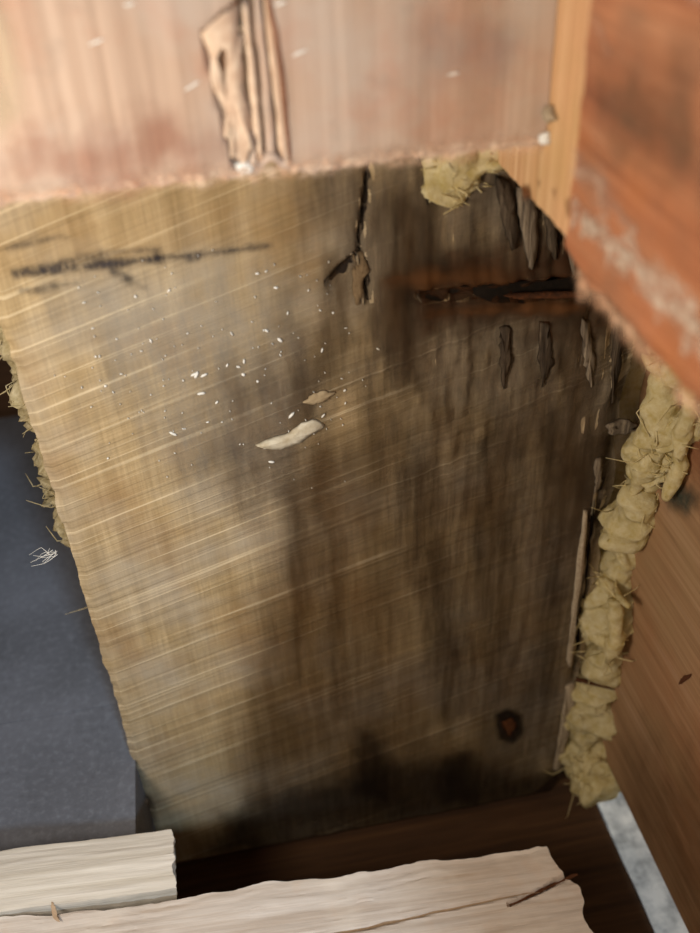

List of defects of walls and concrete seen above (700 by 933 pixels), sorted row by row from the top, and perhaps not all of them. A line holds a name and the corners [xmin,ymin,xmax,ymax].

spalling [201,0,291,174]
water stain [13,255,165,276]
crack [329,162,371,305]
water stain [313,158,628,754]
water stain [226,522,556,848]
crack [335,873,578,933]